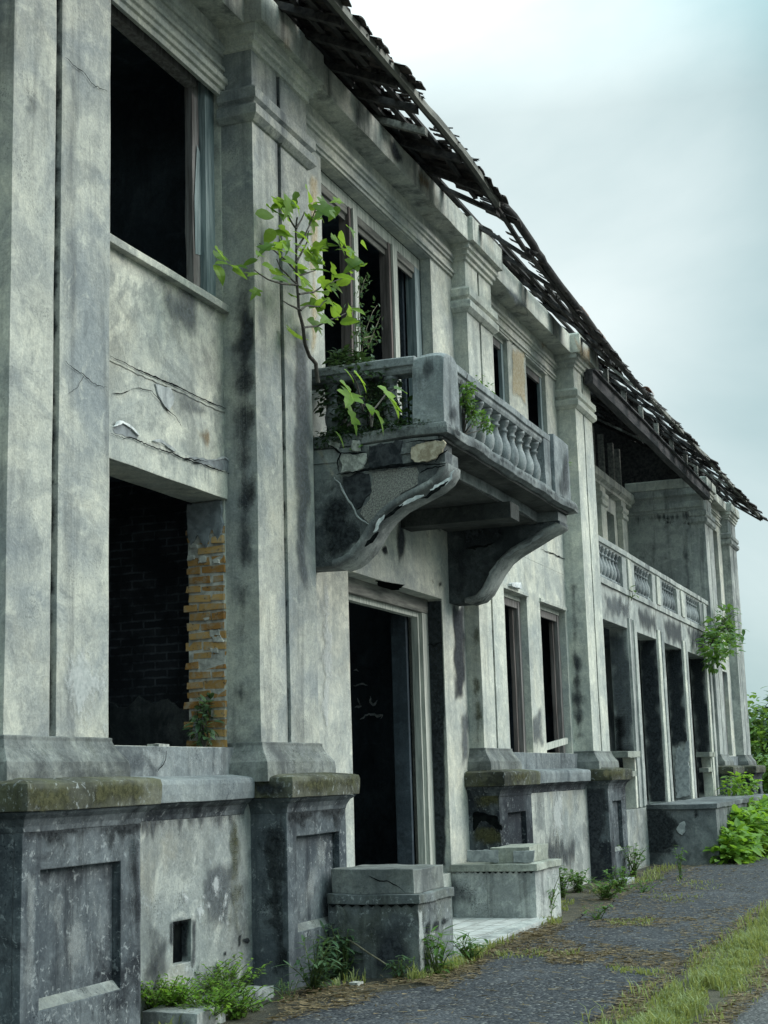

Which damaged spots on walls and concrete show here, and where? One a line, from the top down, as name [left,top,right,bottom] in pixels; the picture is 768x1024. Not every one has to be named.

crack [67,356,229,474]
damp [233,293,254,467]
damp [240,482,253,561]
spalling [326,440,454,547]
damp [572,654,582,724]